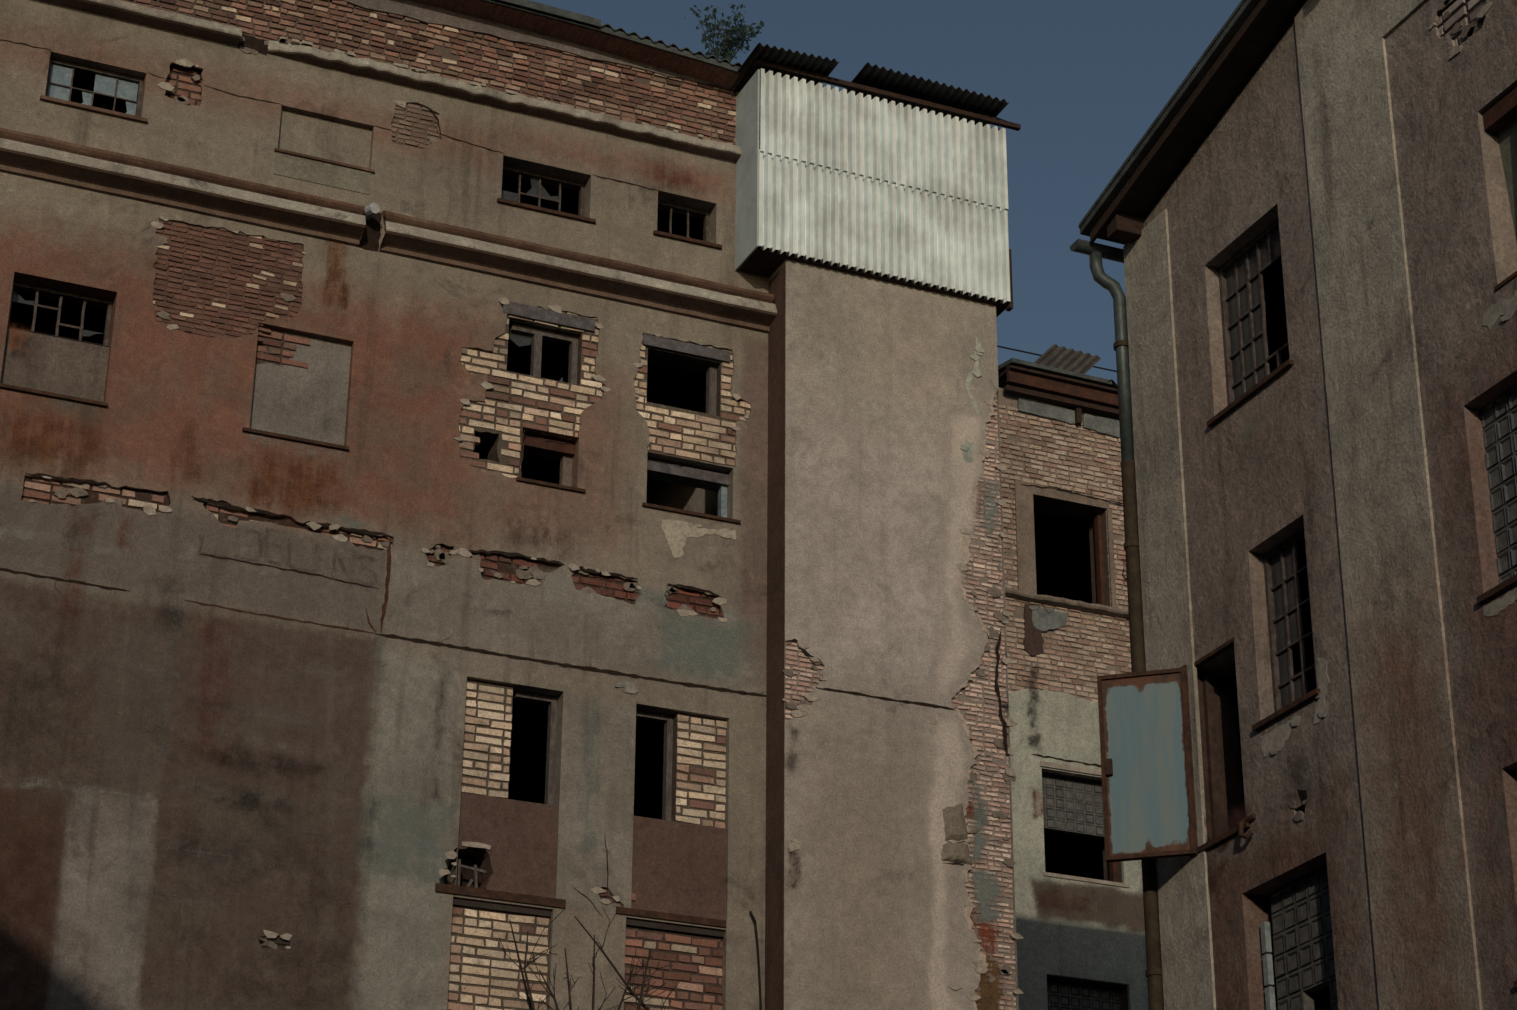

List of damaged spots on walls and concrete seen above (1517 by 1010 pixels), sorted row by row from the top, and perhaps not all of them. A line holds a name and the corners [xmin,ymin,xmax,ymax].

flaking render [1429,0,1494,60]
flaking render [391,100,441,149]
flaking render [151,216,310,369]
flaking render [453,297,610,478]
flaking render [631,332,751,466]
flaking render [21,476,173,516]
flaking render [193,499,393,551]
flaking render [421,545,642,604]
flaking render [664,585,728,623]
flaking render [1483,587,1517,617]
flaking render [781,640,827,720]
flaking render [951,337,1069,1010]